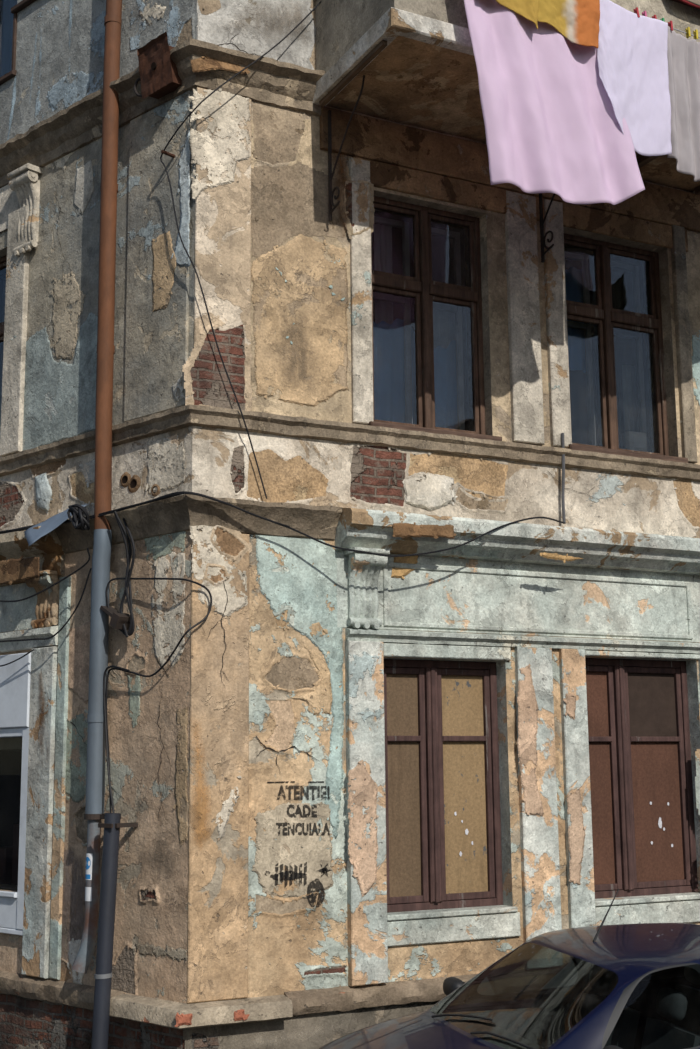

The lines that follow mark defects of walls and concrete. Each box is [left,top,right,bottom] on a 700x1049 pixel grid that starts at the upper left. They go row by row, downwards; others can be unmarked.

peeling [45,148,94,214]
peeling [151,88,375,411]
peeling [22,271,98,451]
peeling [691,330,700,405]
flaking render [0,478,27,531]
spalling [226,442,332,504]
flaking render [345,443,511,539]
crack [155,692,171,827]
peeling [125,525,379,919]
peeling [49,938,84,985]